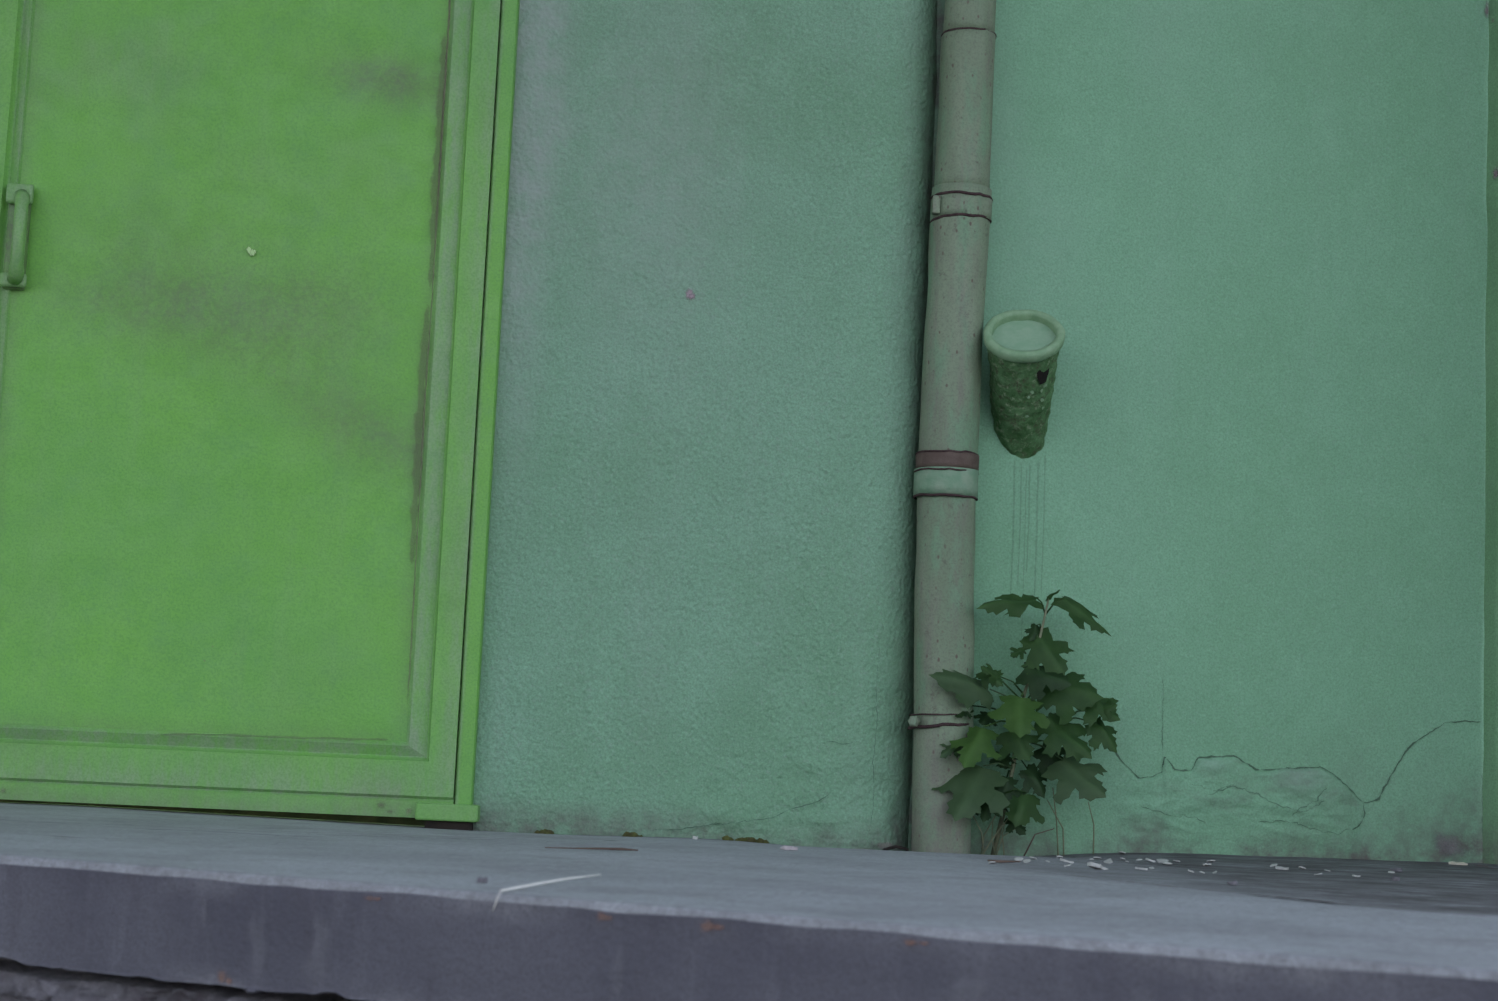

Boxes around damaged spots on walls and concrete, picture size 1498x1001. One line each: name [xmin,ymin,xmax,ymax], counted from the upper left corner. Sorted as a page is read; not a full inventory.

crack [1115,681,1479,835]